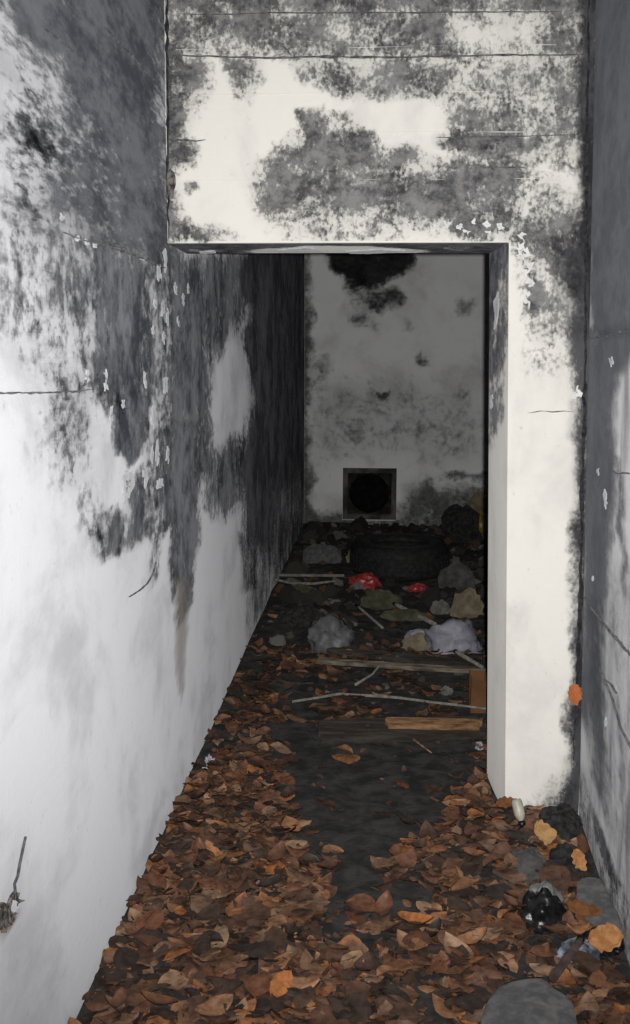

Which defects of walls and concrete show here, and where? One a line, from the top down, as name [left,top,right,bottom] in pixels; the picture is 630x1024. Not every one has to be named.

peeling [430,218,505,235]
peeling [516,232,535,308]
peeling [122,405,170,503]
damp [0,0,630,814]
damp [581,810,630,956]